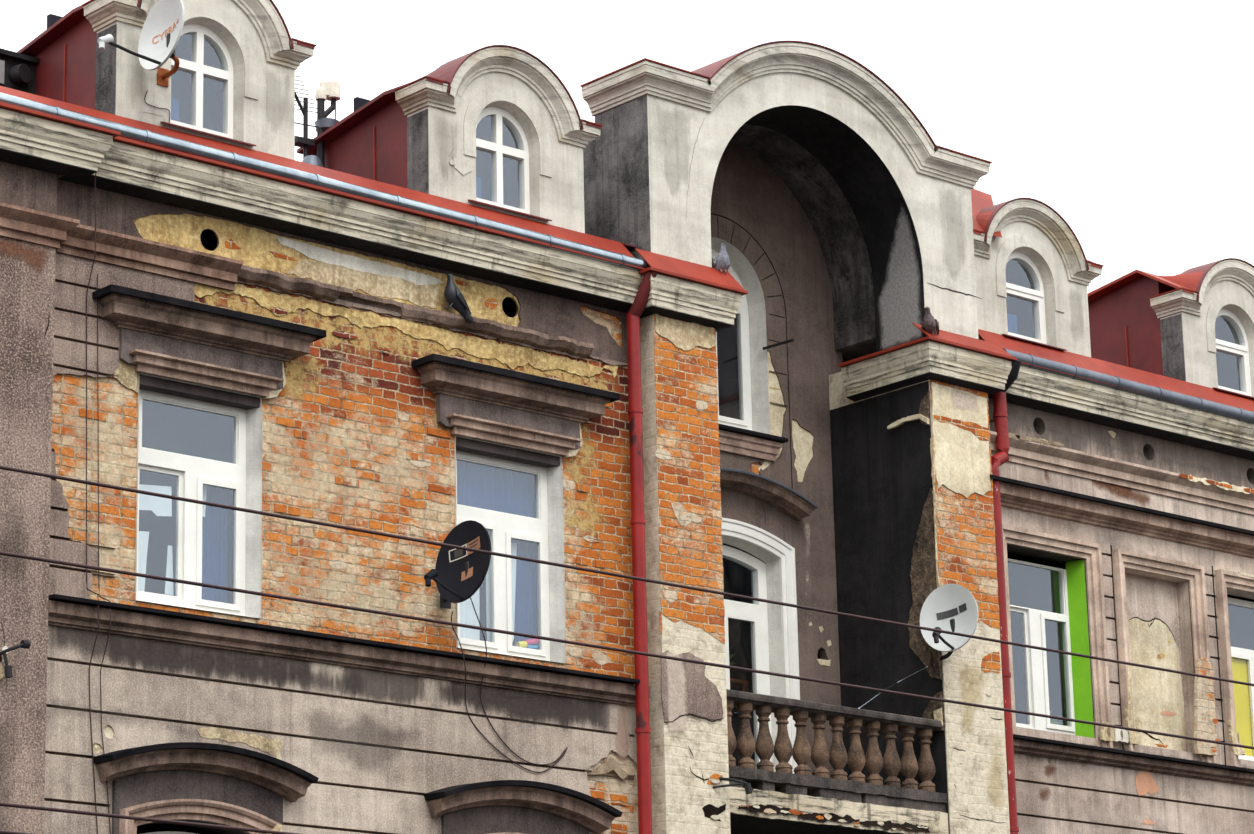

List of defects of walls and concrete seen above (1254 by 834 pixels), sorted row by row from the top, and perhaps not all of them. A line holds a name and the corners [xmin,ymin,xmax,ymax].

flaking render [52,214,635,685]
flaking render [653,314,725,643]
flaking render [750,351,814,482]
flaking render [1179,474,1254,494]
flaking render [887,380,1000,731]
leakage [57,626,629,757]
flaking render [1107,618,1186,752]
spalling [702,804,930,833]